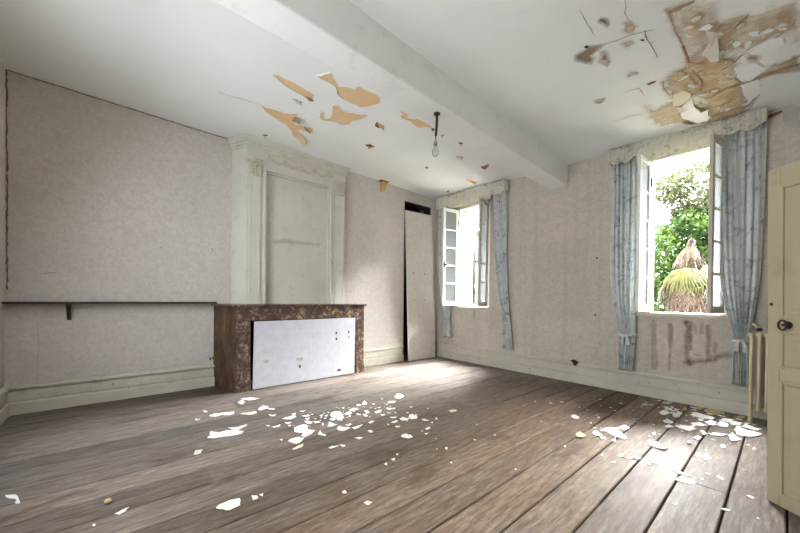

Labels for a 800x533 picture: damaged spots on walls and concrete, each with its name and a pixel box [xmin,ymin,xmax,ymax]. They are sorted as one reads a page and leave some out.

crack [581,0,660,58]
peeling [260,74,315,146]
peeling [316,72,380,125]
peeling [401,111,444,138]
peeling [734,35,786,104]